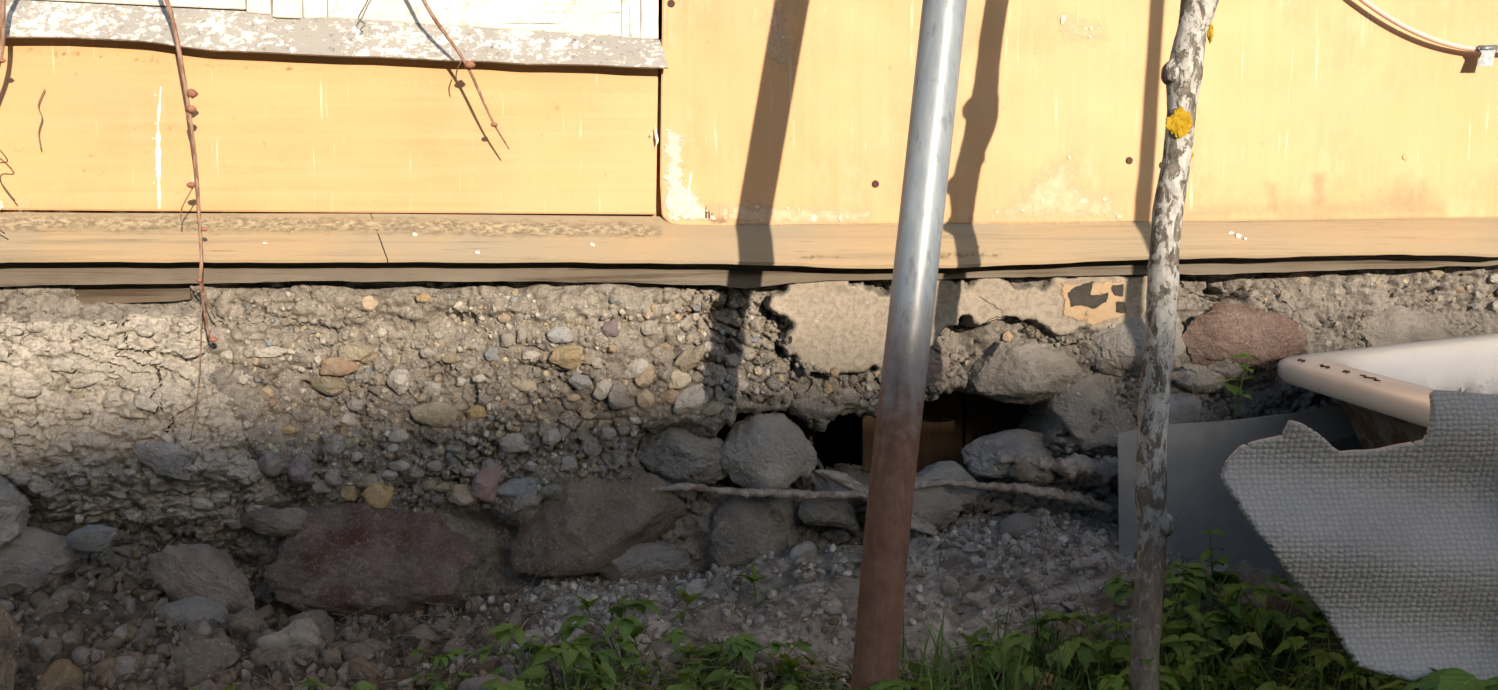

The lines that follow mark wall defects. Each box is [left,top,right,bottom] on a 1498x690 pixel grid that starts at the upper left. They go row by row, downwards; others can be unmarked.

peeling [97,14,233,32]
peeling [336,25,393,41]
peeling [411,33,584,50]
peeling [992,156,1122,219]
peeling [1062,280,1126,325]